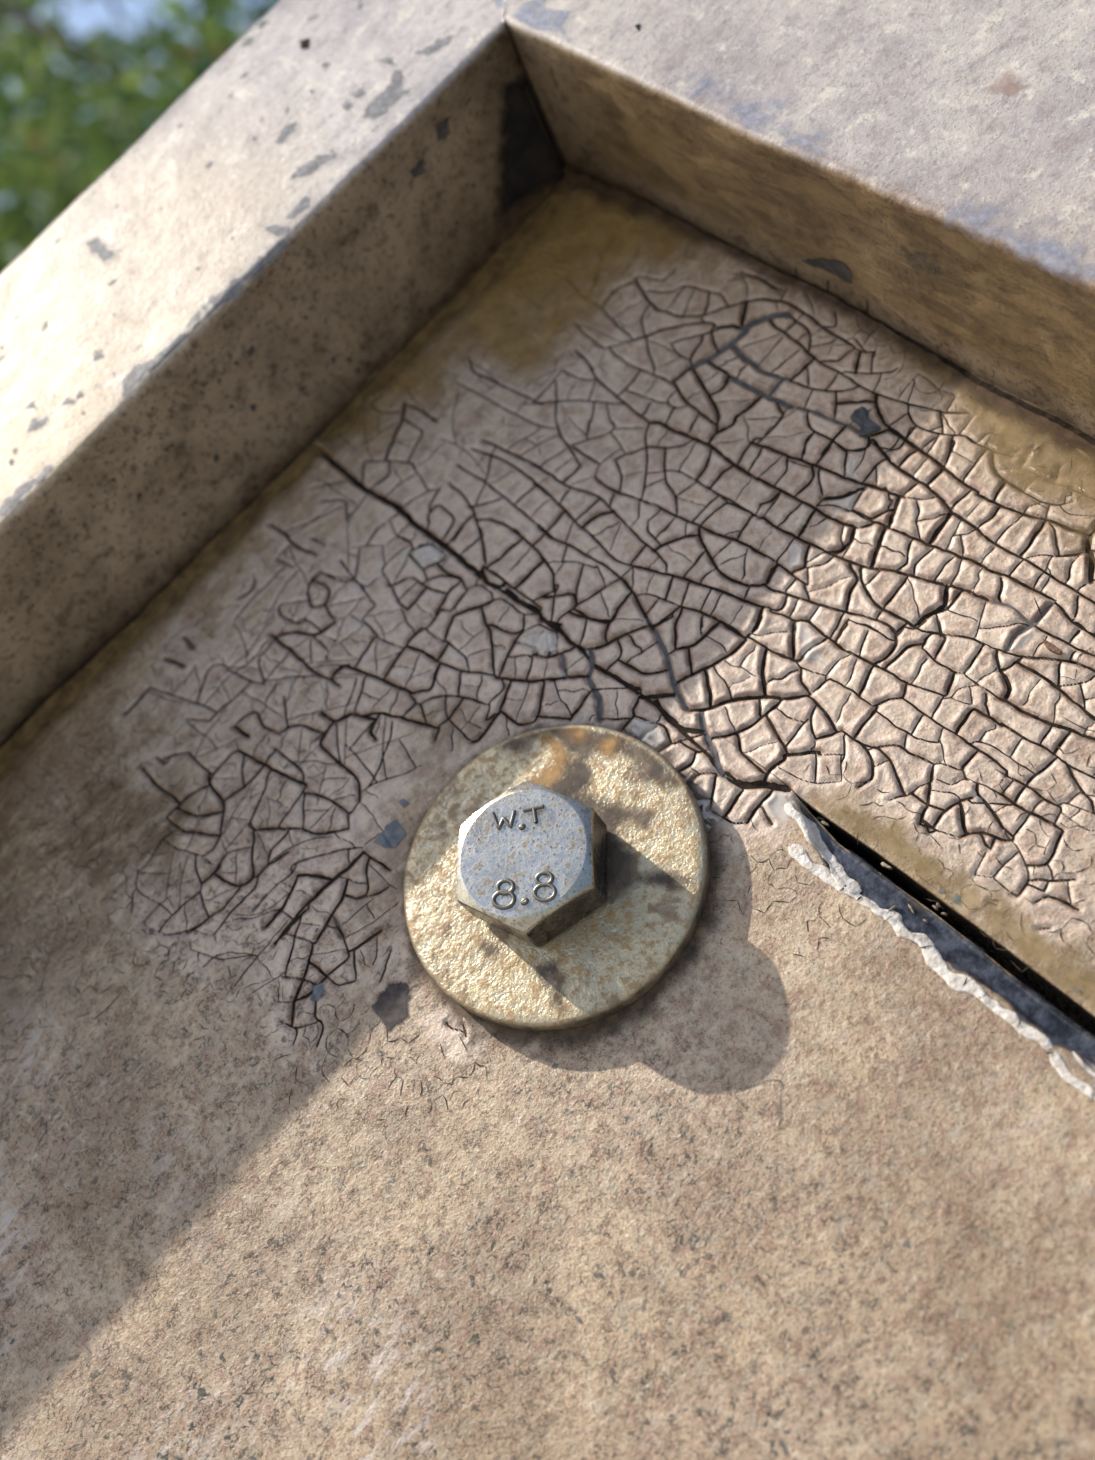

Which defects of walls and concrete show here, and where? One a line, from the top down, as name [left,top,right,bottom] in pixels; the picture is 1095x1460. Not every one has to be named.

rust [532,729,583,786]